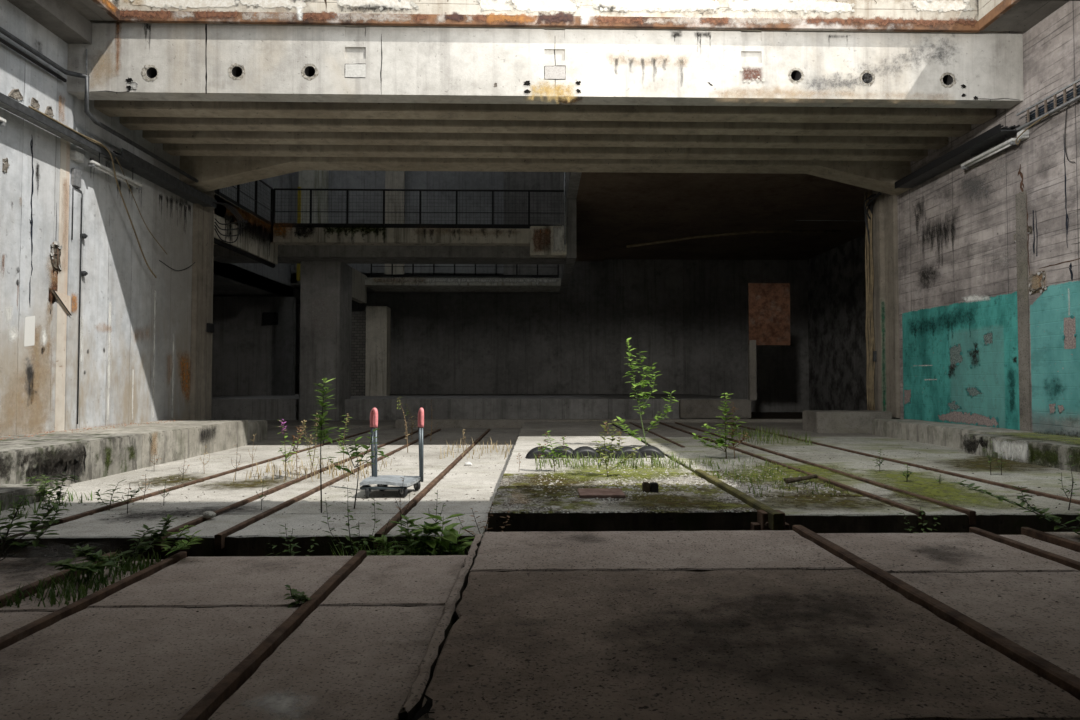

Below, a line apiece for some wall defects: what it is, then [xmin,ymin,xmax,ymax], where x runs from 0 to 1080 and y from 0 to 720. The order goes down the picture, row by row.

peeling [337,0,419,11]
peeling [477,0,580,13]
peeling [593,0,855,14]
corrosion [445,11,574,25]
corrosion [595,15,643,26]
corrosion [700,17,729,25]
leakage [914,202,955,254]
peeling [1062,315,1076,349]
peeling [949,331,993,369]
leakage [11,365,43,424]
peeling [938,401,999,428]